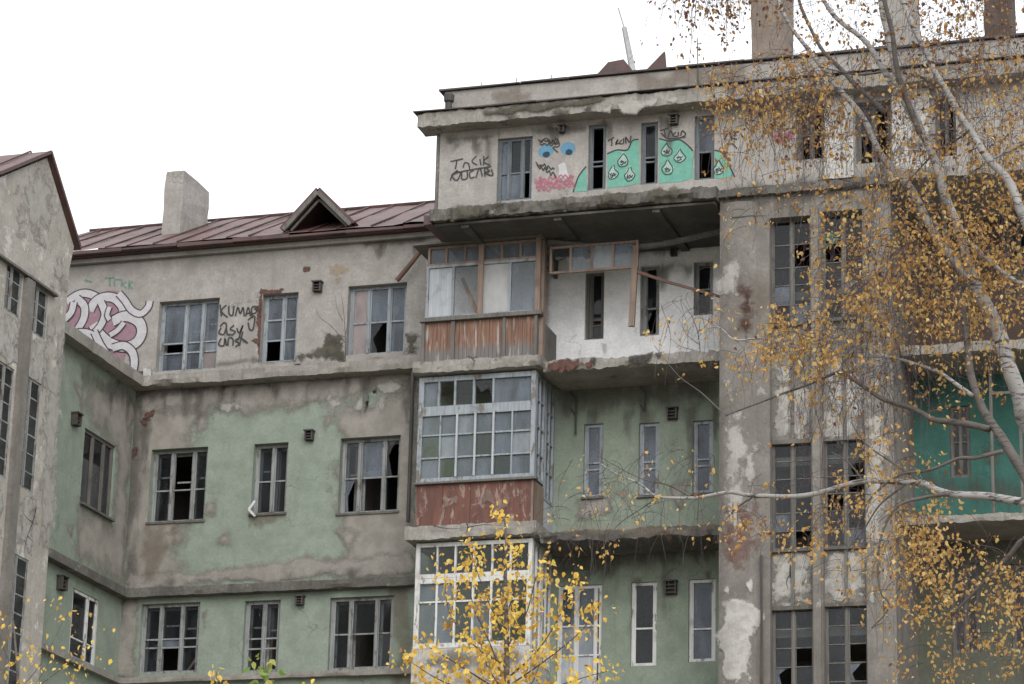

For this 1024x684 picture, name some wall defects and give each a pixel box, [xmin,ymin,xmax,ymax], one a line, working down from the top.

peeling [714,242,746,296]
spalling [548,357,596,373]
spalling [628,351,662,364]
peeling [68,373,425,584]
peeling [723,379,758,541]
peeling [772,552,812,606]
peeling [715,578,765,684]